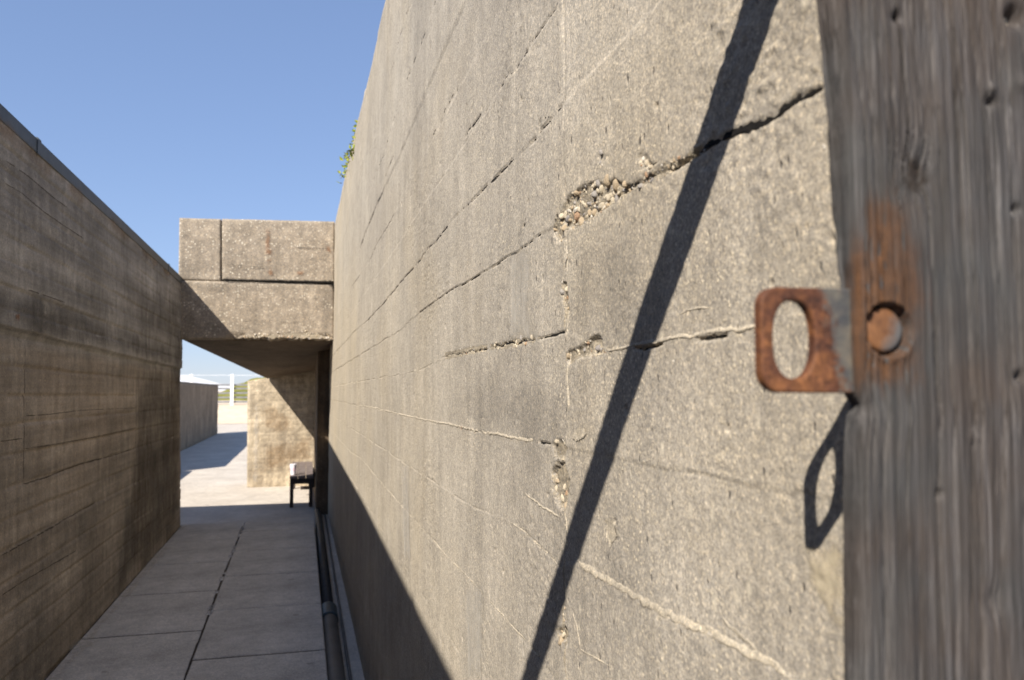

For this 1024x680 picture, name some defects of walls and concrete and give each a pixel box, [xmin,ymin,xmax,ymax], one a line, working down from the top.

crack [630,87,822,189]
spalling [553,143,708,242]
crack [705,333,727,341]
corrosion [853,218,915,381]
spalling [551,427,586,510]